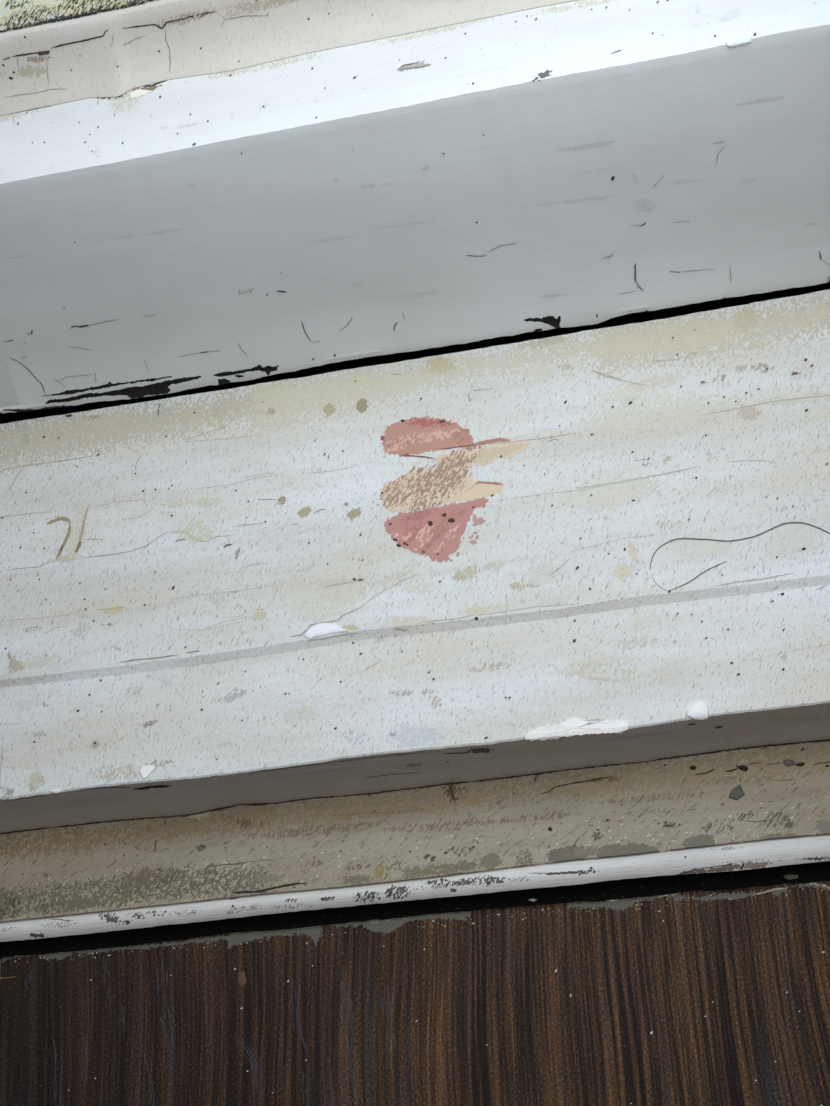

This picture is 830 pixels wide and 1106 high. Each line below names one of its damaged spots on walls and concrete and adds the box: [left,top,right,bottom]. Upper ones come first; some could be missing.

damp [0,56,52,79]
crack [3,0,268,121]
peeling [4,364,279,417]
peeling [380,416,530,563]
spalling [352,872,414,903]
spalling [425,860,517,892]
peeling [532,855,599,875]
spalling [0,910,471,961]